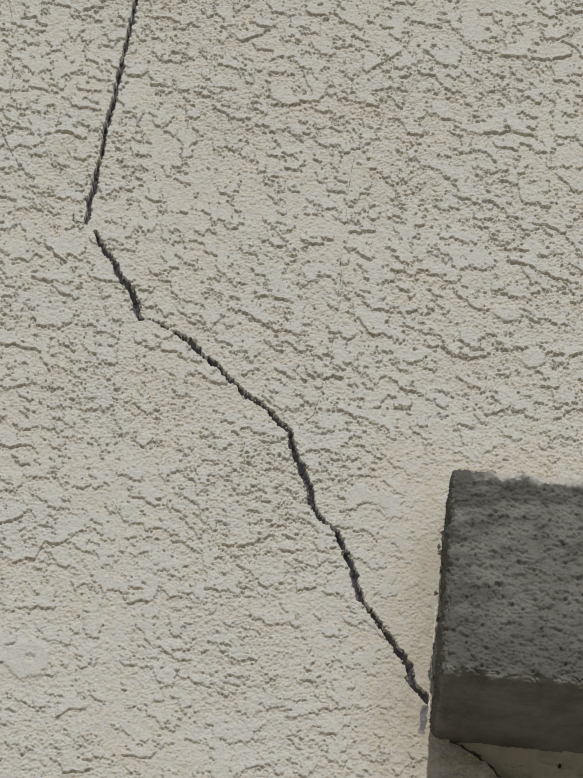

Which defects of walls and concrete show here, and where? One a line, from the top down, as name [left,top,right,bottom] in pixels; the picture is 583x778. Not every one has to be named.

crack [73,0,429,707]
crack [450,742,502,778]